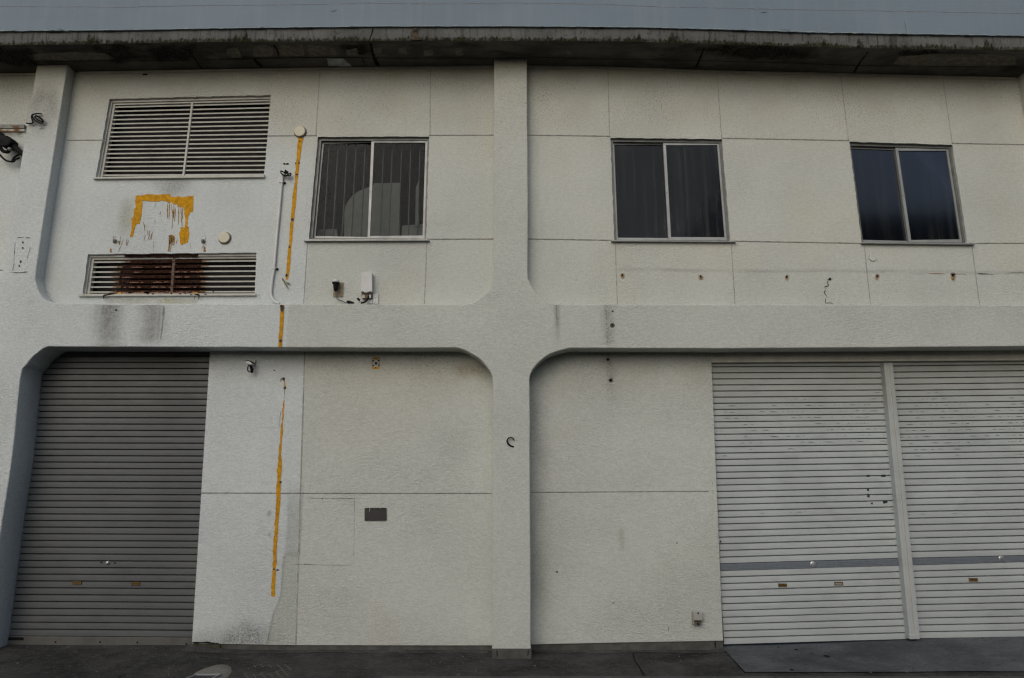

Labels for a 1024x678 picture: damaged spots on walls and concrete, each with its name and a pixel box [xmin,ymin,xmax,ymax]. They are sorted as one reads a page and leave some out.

rust [103,240,214,301]